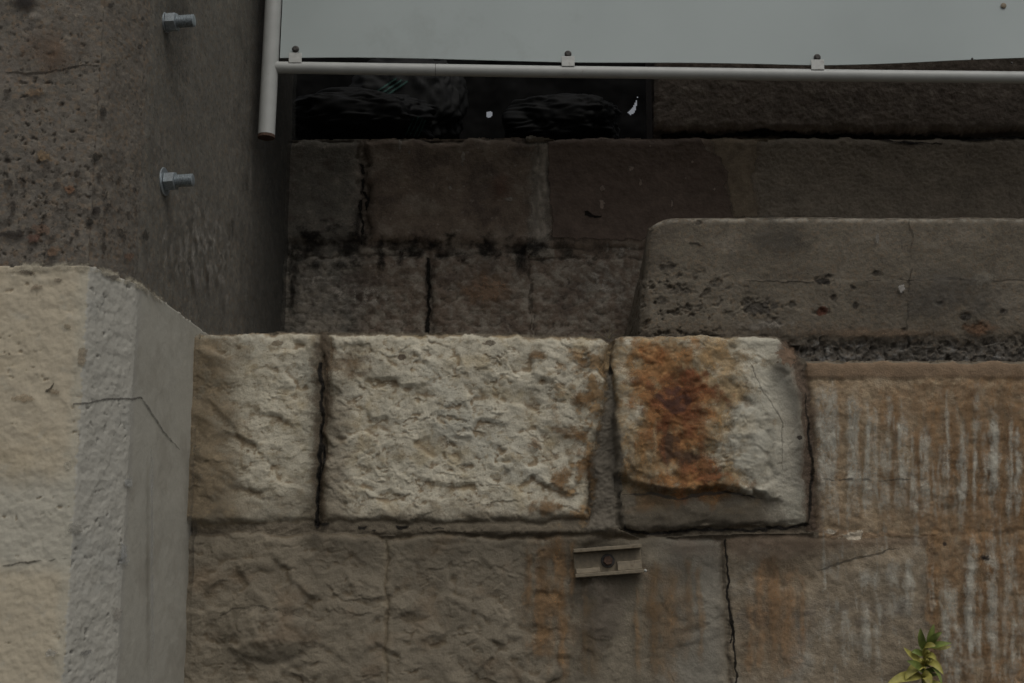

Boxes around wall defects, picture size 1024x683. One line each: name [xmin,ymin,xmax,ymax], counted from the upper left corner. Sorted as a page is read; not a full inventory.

crack [358,164,370,245]
crack [424,258,432,334]
crack [73,397,172,442]
corrosion [529,335,750,528]
efflorescence [943,420,1021,511]
crack [618,393,922,683]
efflorescence [942,546,1013,675]